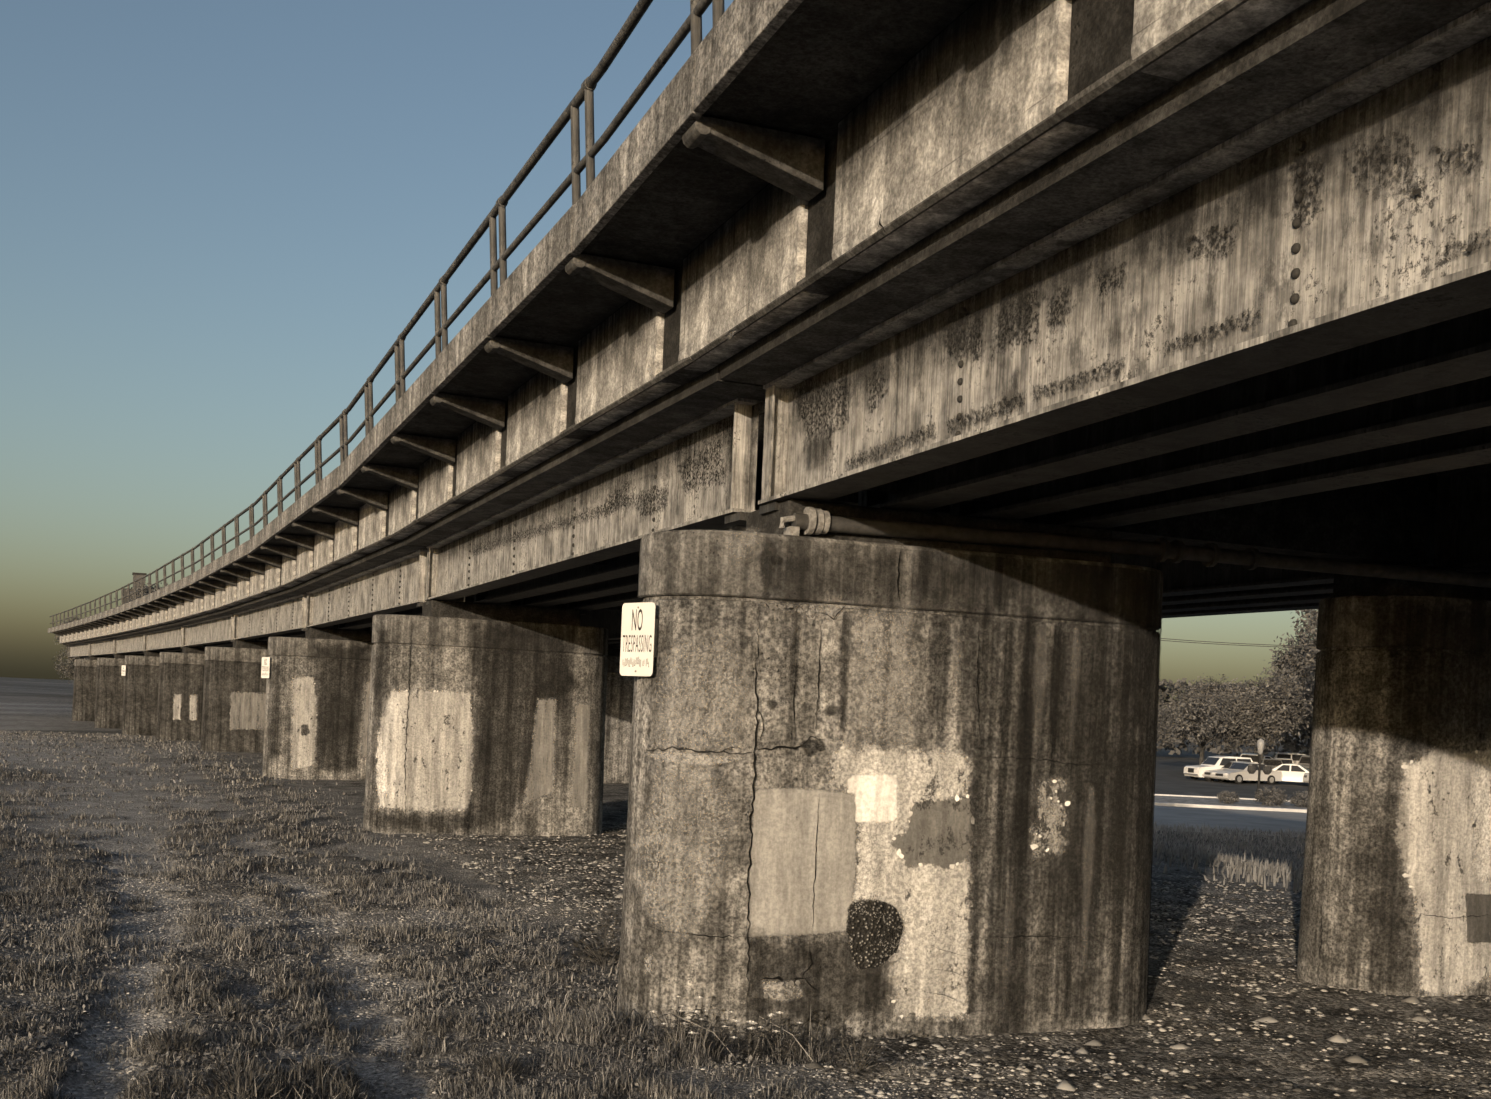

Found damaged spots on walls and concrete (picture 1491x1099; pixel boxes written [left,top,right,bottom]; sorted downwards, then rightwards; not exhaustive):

water stain [795,36,1491,415]
crack [647,602,846,1005]
water stain [823,551,1161,1025]
water stain [1371,777,1412,990]
water stain [1383,601,1491,752]